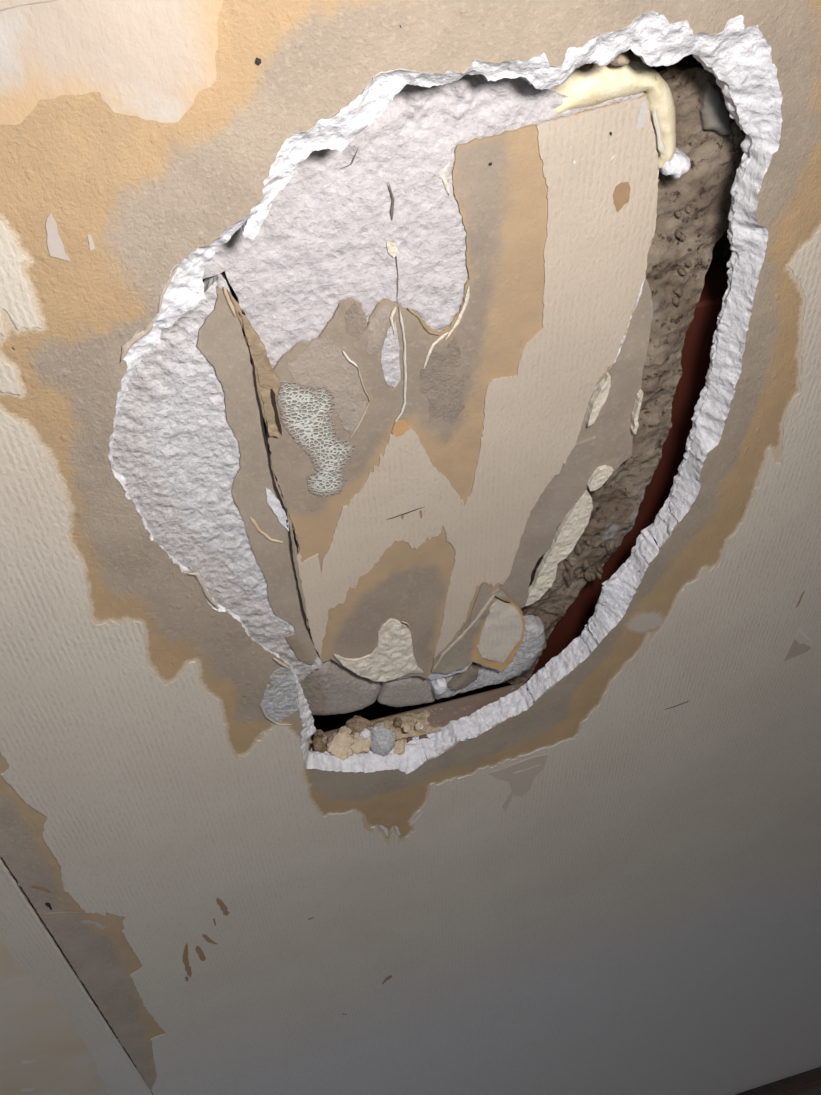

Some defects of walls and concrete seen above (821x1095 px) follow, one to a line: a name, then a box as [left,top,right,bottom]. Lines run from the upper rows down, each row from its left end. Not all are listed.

peeling [0,0,821,846]
crack [0,857,154,1095]
peeling [0,752,166,1090]
spalling [183,898,230,982]